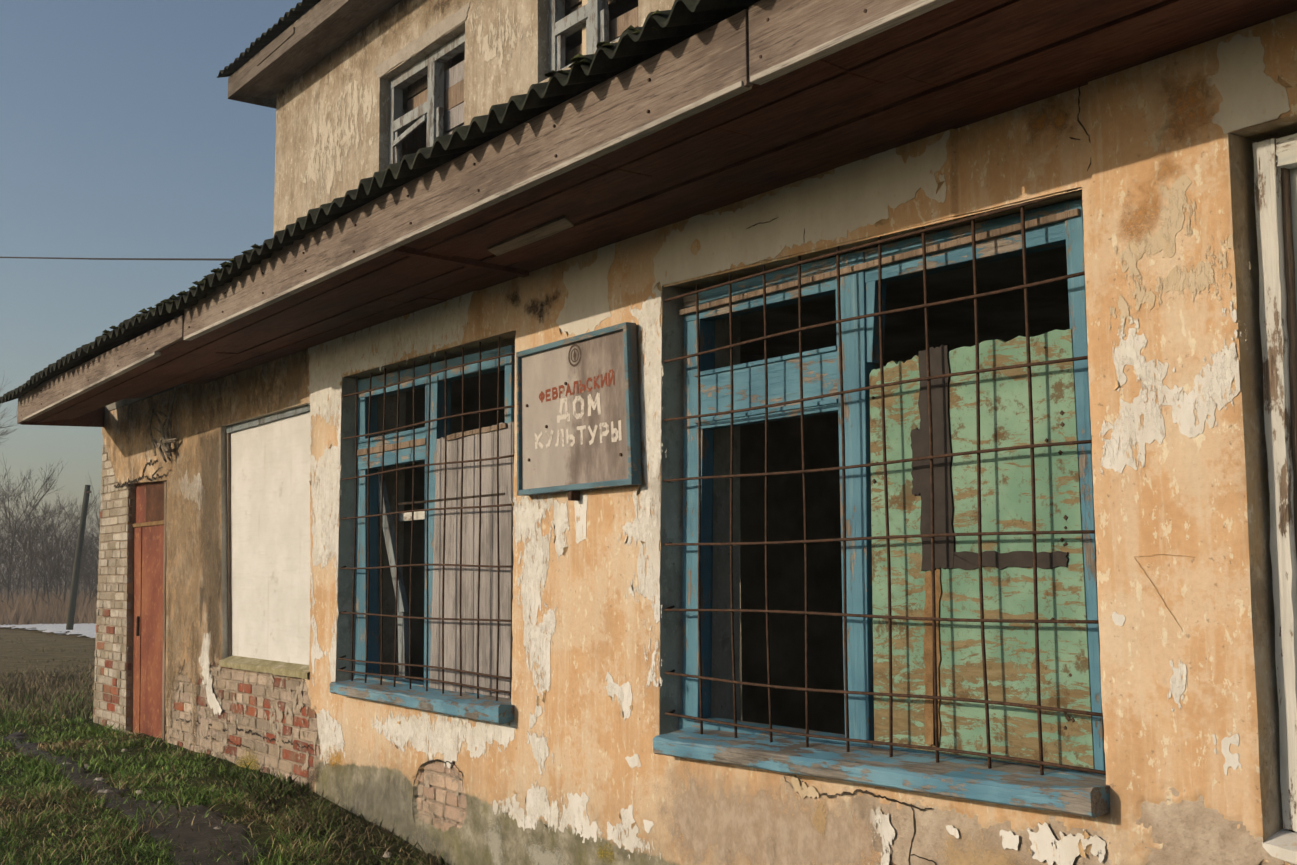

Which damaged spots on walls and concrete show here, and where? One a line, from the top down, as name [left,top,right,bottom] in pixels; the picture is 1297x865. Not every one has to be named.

crack [1069,85,1091,171]
peeling [1206,30,1292,134]
peeling [1099,171,1248,474]
peeling [556,130,950,720]
flaking render [166,292,473,789]
peeling [371,494,661,859]
damp [485,827,503,865]
damp [528,843,563,865]
damp [661,771,873,865]
crack [783,776,936,865]
spalling [845,788,1112,865]
spalling [1136,787,1296,865]